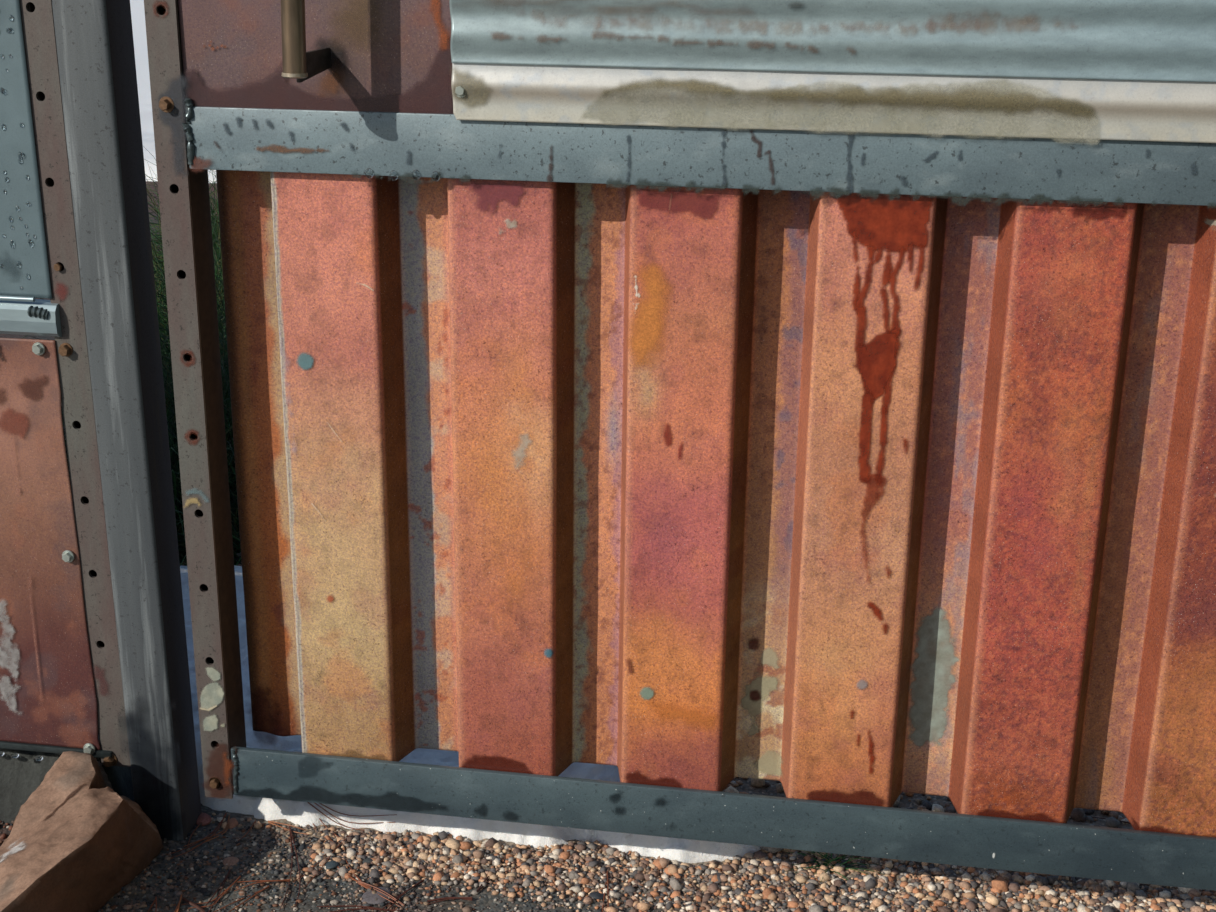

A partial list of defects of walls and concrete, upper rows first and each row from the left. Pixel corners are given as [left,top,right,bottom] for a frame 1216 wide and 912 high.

rust [431,0,448,49]
leakage [584,81,1098,218]
rust [631,267,665,362]
rust [834,194,933,530]
rust [664,425,682,459]
rust [0,337,107,750]
rust [868,602,887,634]
peeling [909,608,959,747]
rust [204,744,234,798]
rust [857,731,875,774]